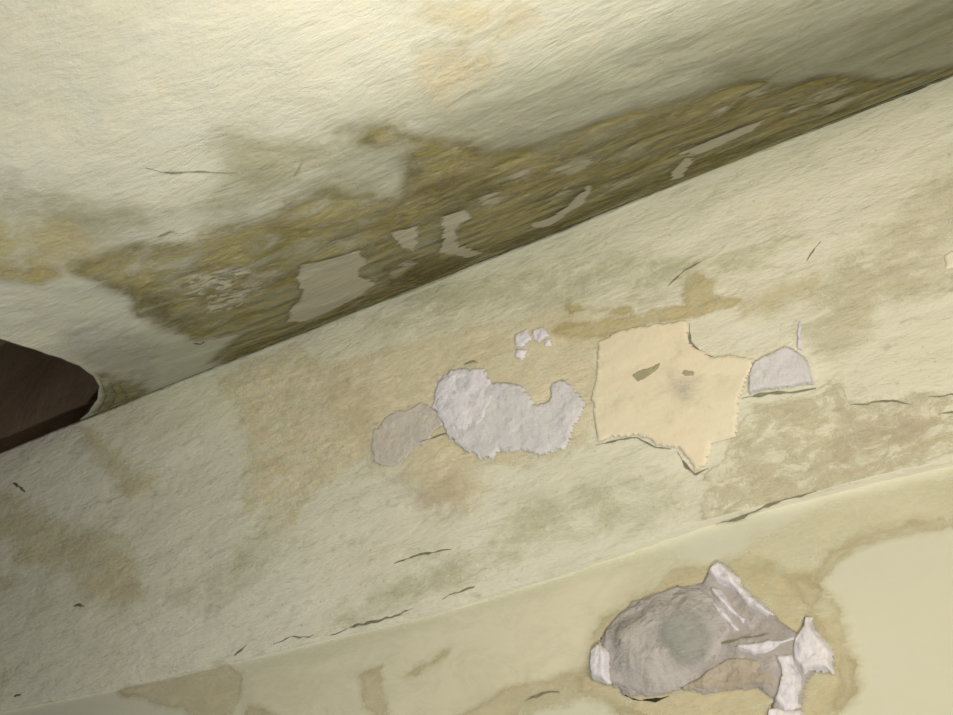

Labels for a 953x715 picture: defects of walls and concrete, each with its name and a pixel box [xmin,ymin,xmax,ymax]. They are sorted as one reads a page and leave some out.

damp [71,68,953,522]
peeling [371,321,816,475]
damp [119,560,770,715]
spalling [590,562,836,715]
damp [732,482,953,715]